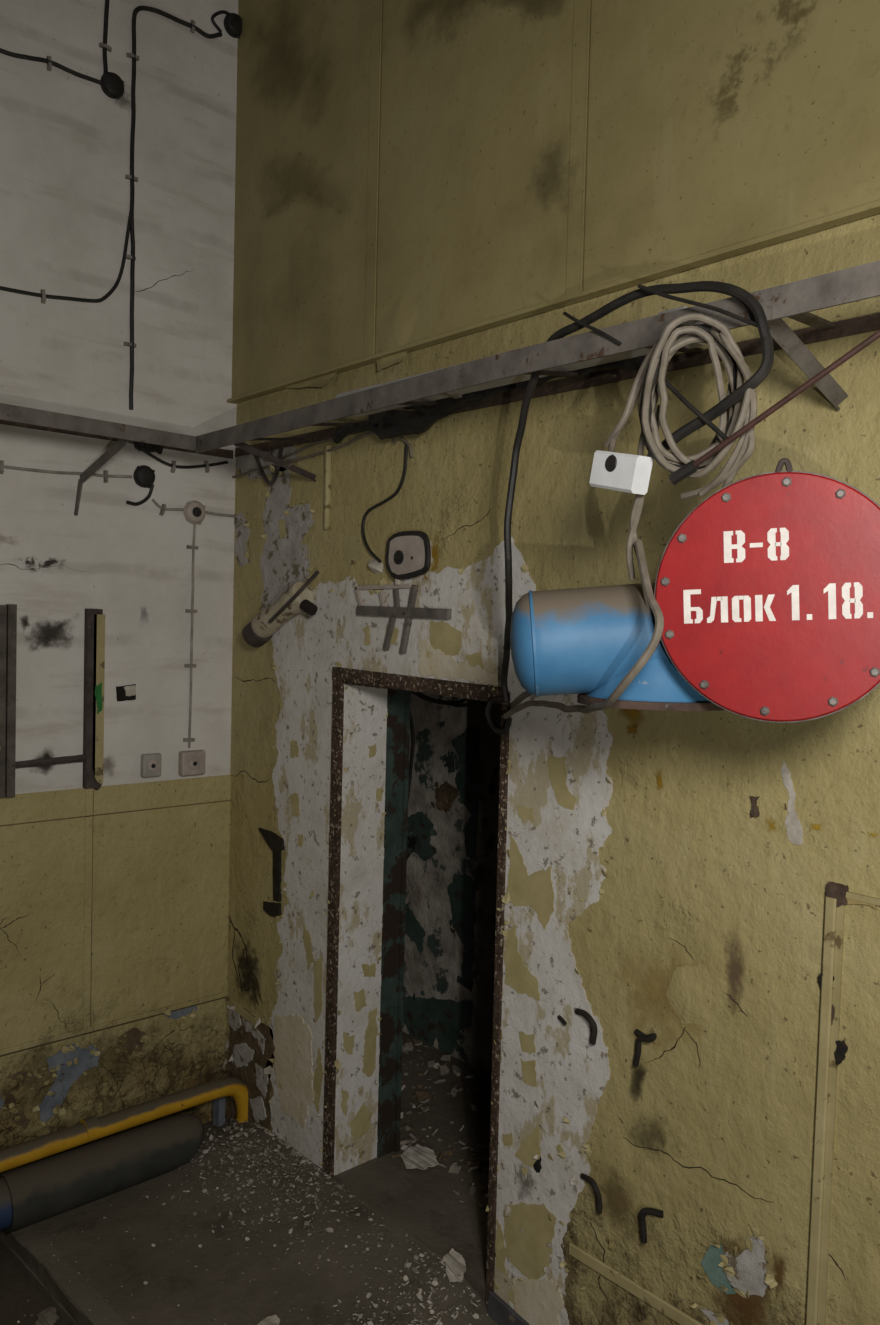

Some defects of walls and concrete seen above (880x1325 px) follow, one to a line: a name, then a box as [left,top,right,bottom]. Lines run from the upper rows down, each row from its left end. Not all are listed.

peeling [221,437,613,1325]
peeling [0,1028,154,1133]
crack [590,1222,609,1325]
peeling [691,1303,733,1325]
peeling [698,1227,778,1299]